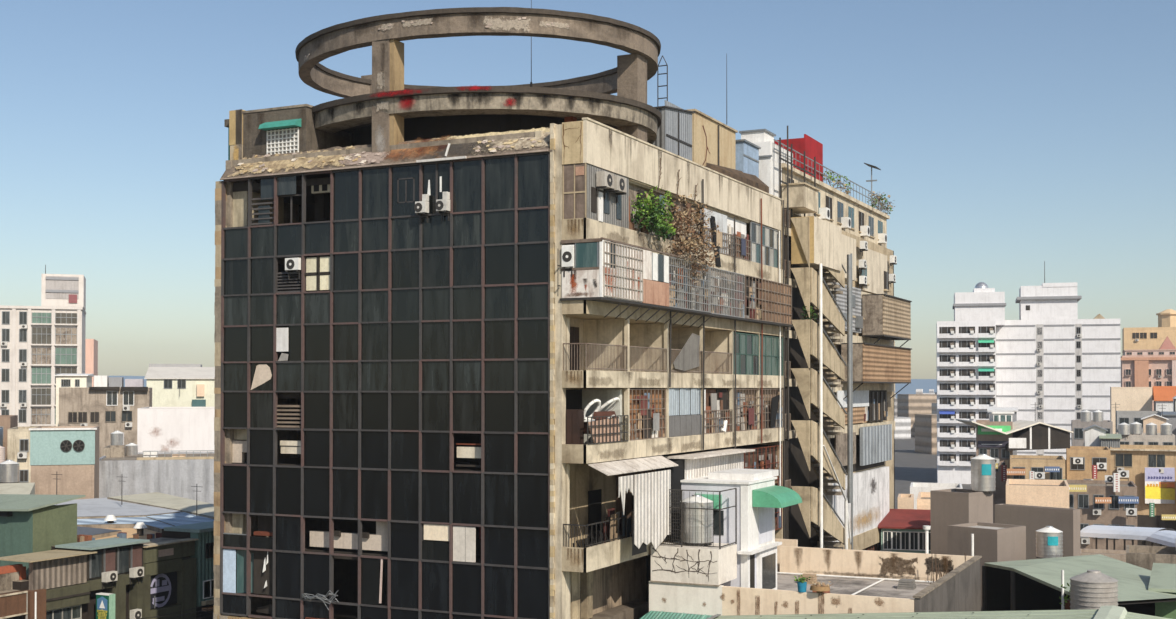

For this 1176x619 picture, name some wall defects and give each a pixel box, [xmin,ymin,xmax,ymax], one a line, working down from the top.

corrosion [570,270,612,296]
crack [652,548,717,582]
water stain [818,550,953,614]